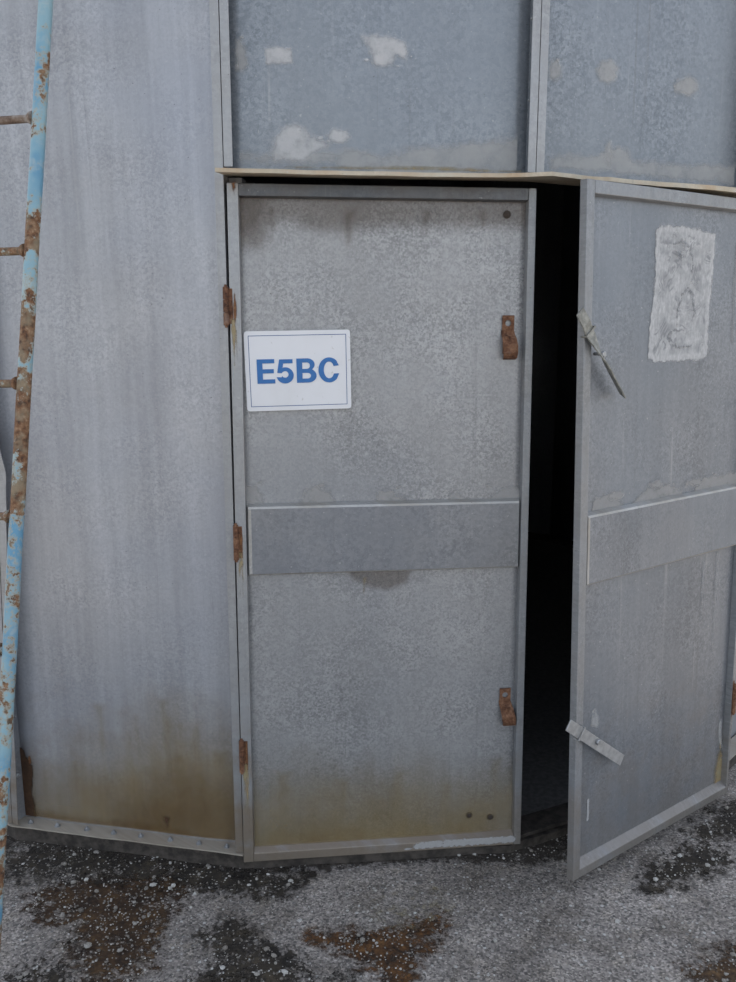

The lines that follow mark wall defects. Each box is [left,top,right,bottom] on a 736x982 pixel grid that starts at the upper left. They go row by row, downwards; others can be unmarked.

peeling [266,48,292,63]
peeling [365,37,406,65]
peeling [275,126,349,160]
rust [20,748,36,817]
damp [126,758,235,839]
damp [254,795,427,846]
damp [4,835,568,902]